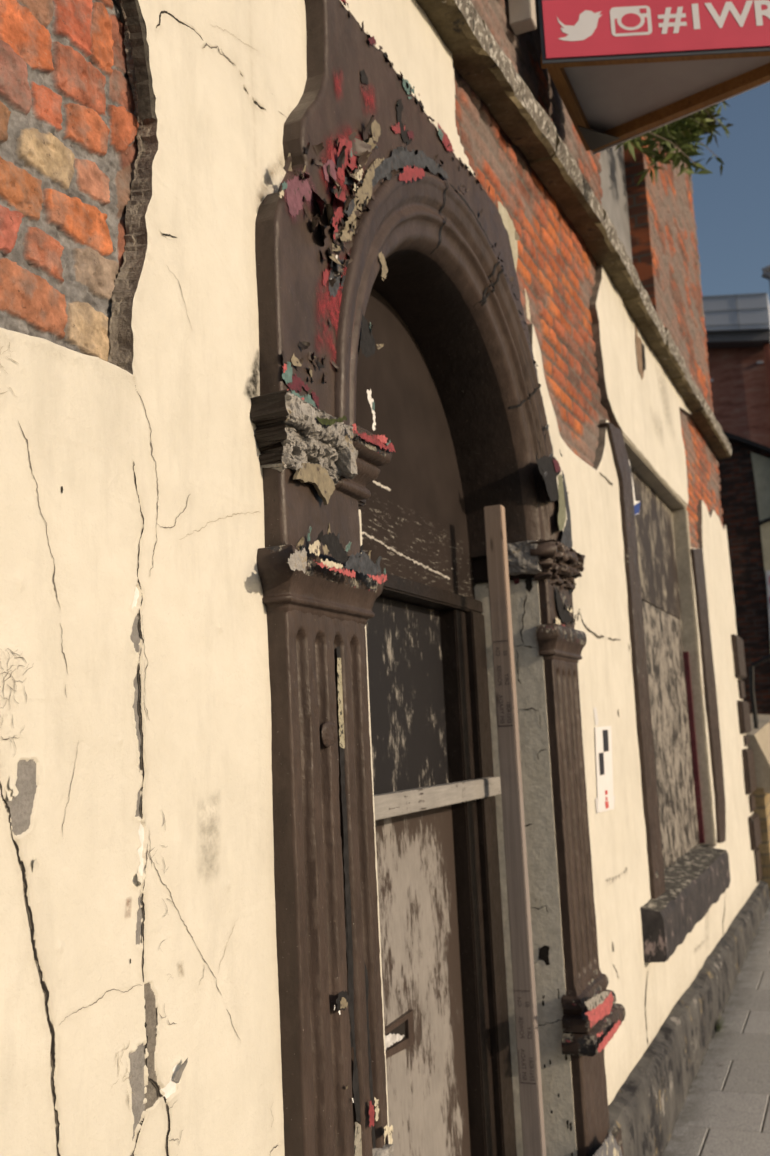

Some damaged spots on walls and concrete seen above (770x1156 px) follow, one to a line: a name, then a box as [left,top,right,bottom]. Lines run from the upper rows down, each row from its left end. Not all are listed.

crack [156,11,286,117]
flaking render [0,0,156,373]
flaking render [250,0,612,626]
flaking render [642,136,713,412]
flaking render [679,410,723,548]
peeling [0,648,37,836]
crack [0,385,259,1156]
peeling [115,983,188,1156]
spalling [369,1097,394,1156]
peeling [584,991,622,1053]
peeling [593,1132,622,1156]